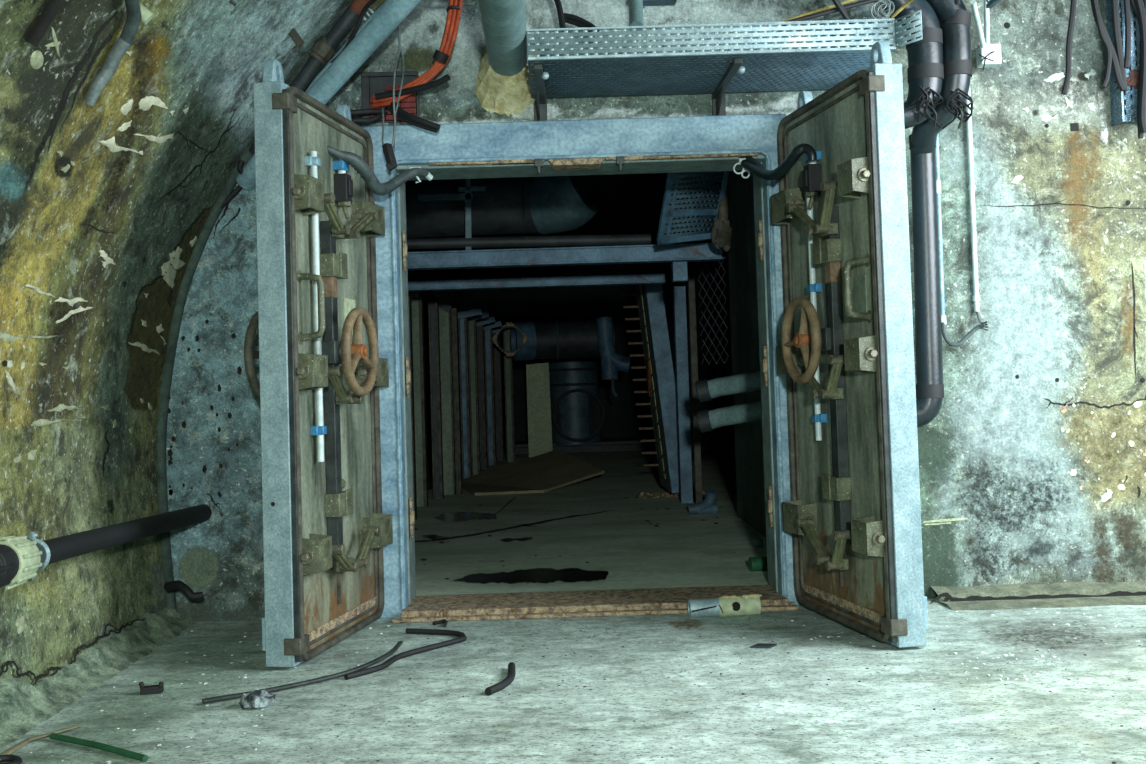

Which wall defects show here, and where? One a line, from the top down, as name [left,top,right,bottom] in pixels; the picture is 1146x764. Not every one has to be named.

crack [156,105,239,203]
crack [982,199,1146,209]
spalling [124,206,213,414]
crack [1044,266,1146,409]
spalling [168,421,187,465]
crack [0,612,154,685]